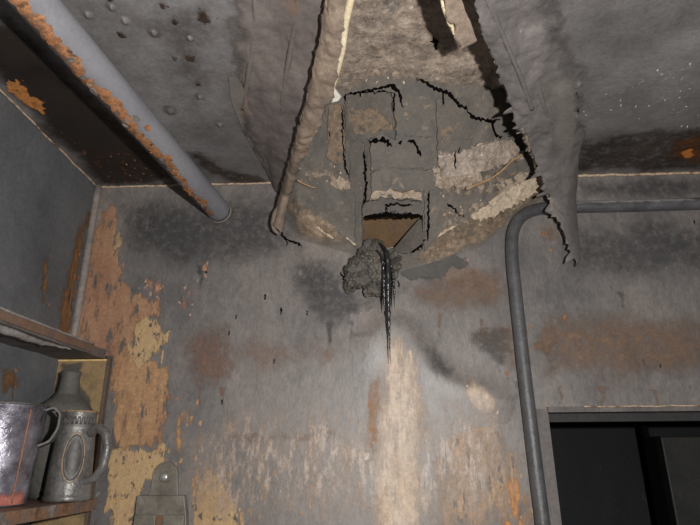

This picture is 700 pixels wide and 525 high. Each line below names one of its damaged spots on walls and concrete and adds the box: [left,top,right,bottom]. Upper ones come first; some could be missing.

rust [7,0,214,215]
crack [329,84,430,253]
crack [416,77,502,139]
peeling [78,205,206,525]
water stain [204,340,522,525]